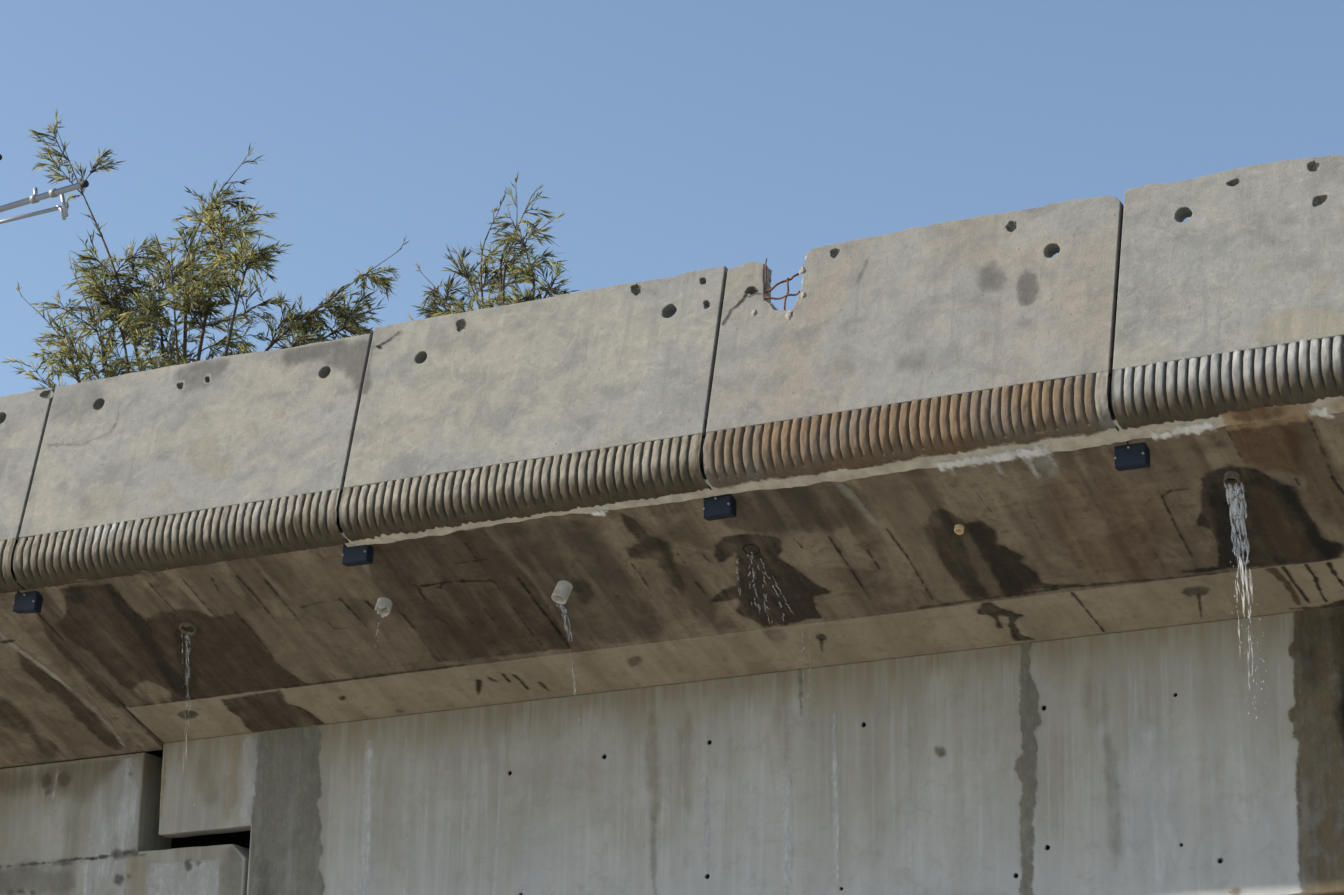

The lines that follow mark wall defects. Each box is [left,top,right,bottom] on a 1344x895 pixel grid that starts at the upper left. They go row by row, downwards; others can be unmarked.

spalling [745,255,807,320]
damp [0,584,480,895]
damp [476,674,548,693]
damp [711,513,829,649]
damp [918,510,1122,895]
damp [1142,465,1344,894]